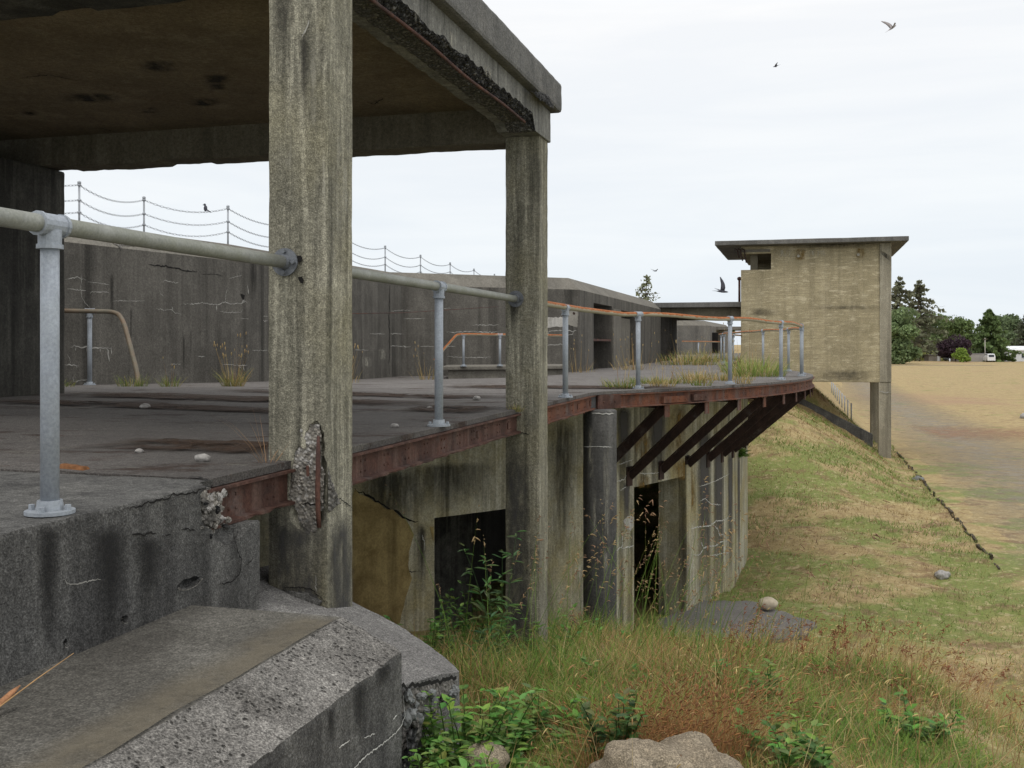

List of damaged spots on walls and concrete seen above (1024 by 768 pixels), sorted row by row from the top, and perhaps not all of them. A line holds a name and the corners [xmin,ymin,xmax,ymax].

spalling [352,0,536,133]
crack [149,264,267,322]
crack [132,528,195,537]
spalling [200,488,232,539]
peeling [289,424,414,624]
crack [301,489,425,546]